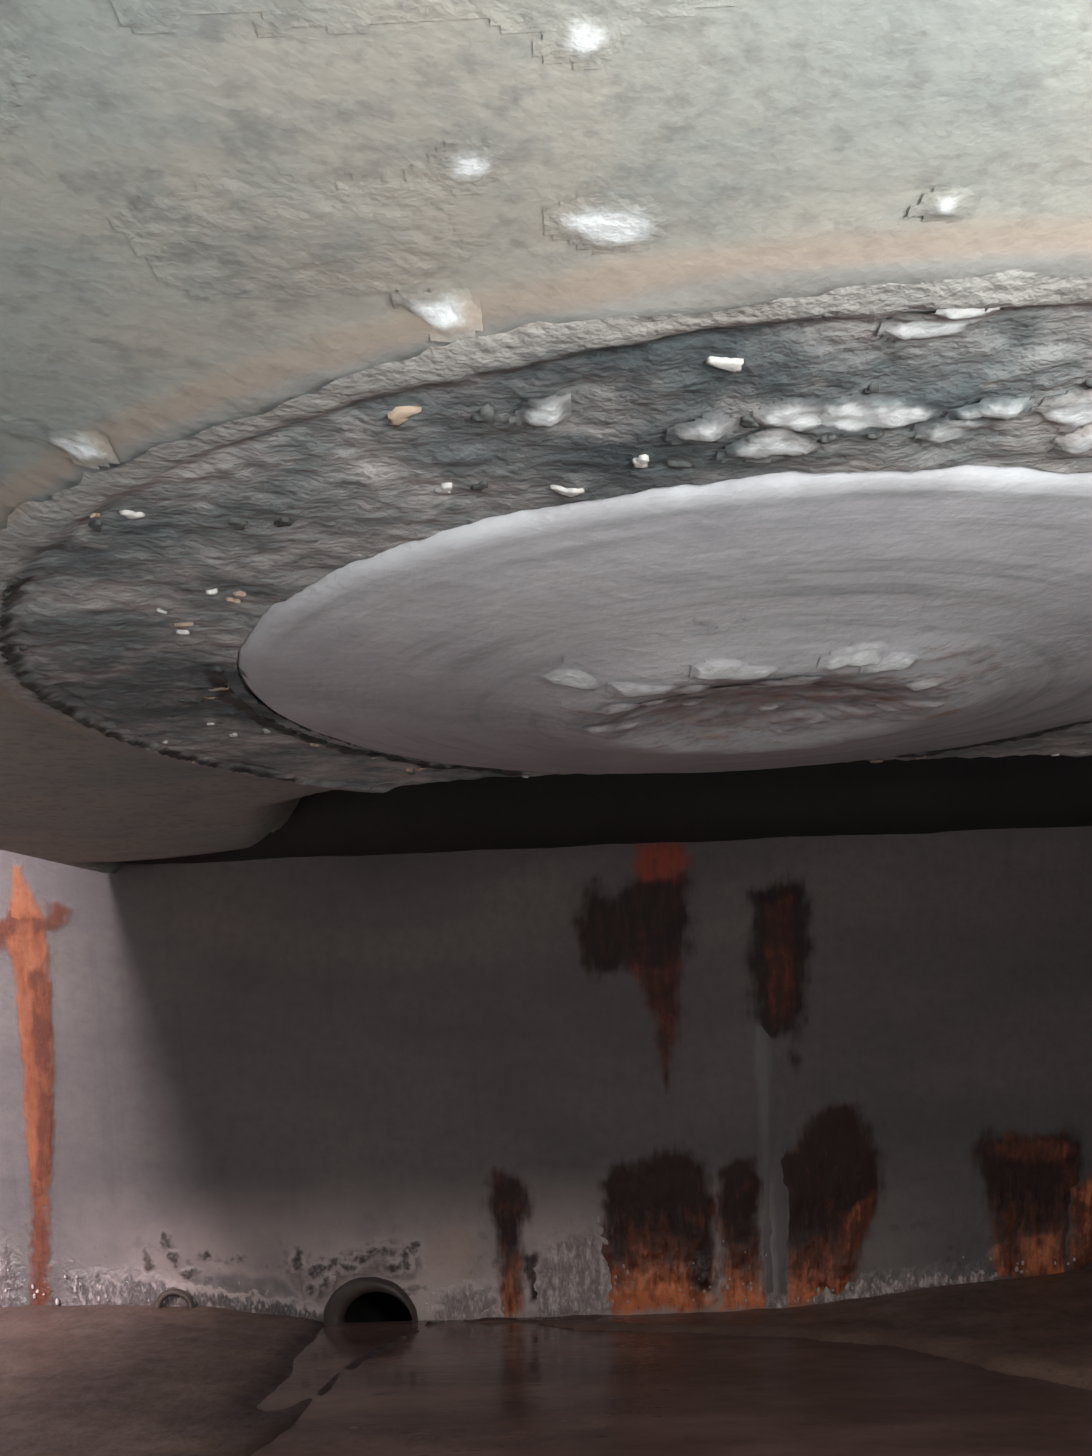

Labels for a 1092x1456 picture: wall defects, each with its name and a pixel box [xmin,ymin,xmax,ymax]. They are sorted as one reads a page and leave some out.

leakage [107,163,492,301]
leakage [509,393,571,428]
leakage [666,389,1092,463]
leakage [877,307,1008,344]
spalling [0,269,1092,793]
crack [0,568,539,783]
corrosion [557,842,708,1103]
corrosion [0,859,79,1305]
leakage [0,1231,324,1322]
corrosion [581,1132,768,1315]
corrosion [781,1086,900,1308]
corrosion [954,1113,1092,1279]